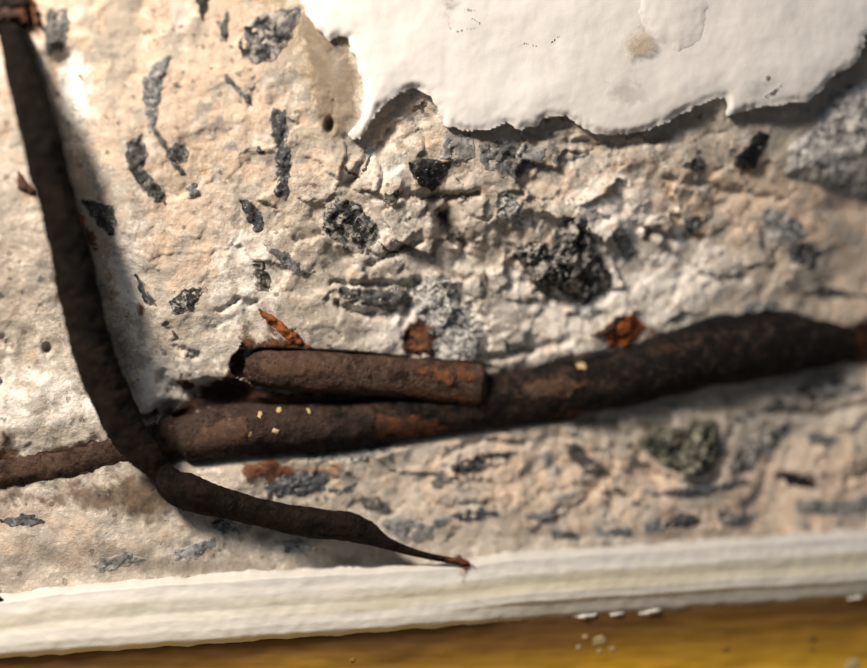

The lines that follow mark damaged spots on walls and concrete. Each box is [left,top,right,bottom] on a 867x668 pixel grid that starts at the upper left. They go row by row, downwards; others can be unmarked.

rust [0,0,46,30]
rust [17,171,35,195]
spalling [24,0,867,432]
spalling [0,44,110,458]
rust [589,313,656,350]
rust [141,308,377,460]
rust [402,318,481,404]
rust [517,373,585,400]
rust [376,414,453,439]
rust [0,432,97,481]
rust [242,457,295,483]
spalling [0,361,867,594]